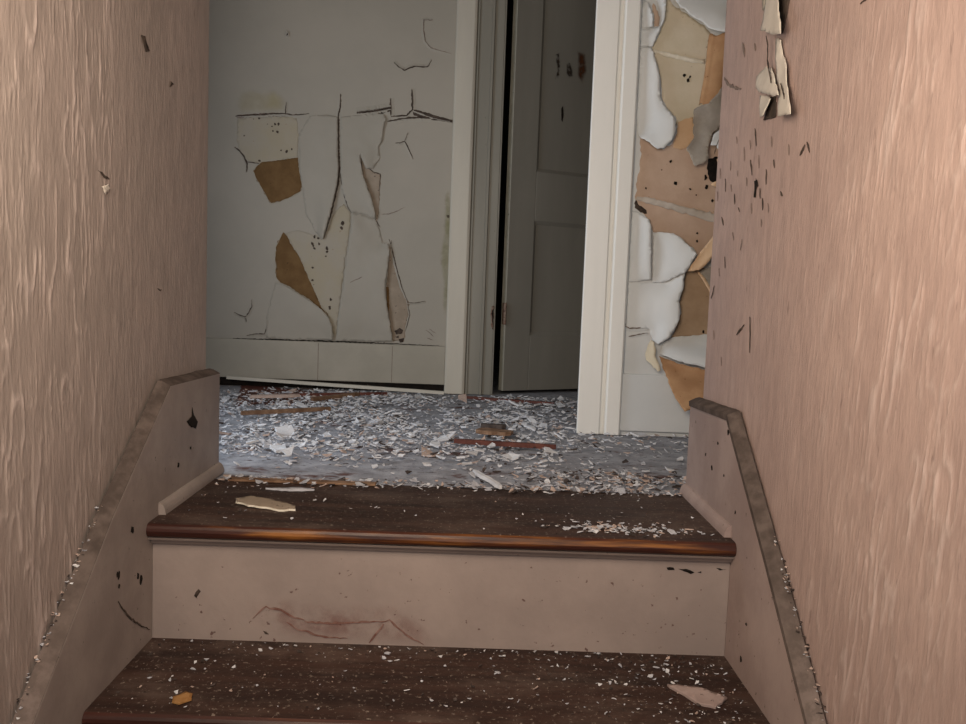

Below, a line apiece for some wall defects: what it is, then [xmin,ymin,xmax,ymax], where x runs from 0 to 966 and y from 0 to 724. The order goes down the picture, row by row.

peeling [756,0,791,120]
crack [234,147,259,172]
flaking render [237,116,302,204]
crack [236,102,309,119]
flaking render [361,158,381,226]
crack [321,17,452,239]
flaking render [635,0,720,255]
peeling [275,232,332,316]
crack [233,239,439,346]
flaking render [386,247,410,342]
flaking render [671,268,710,338]